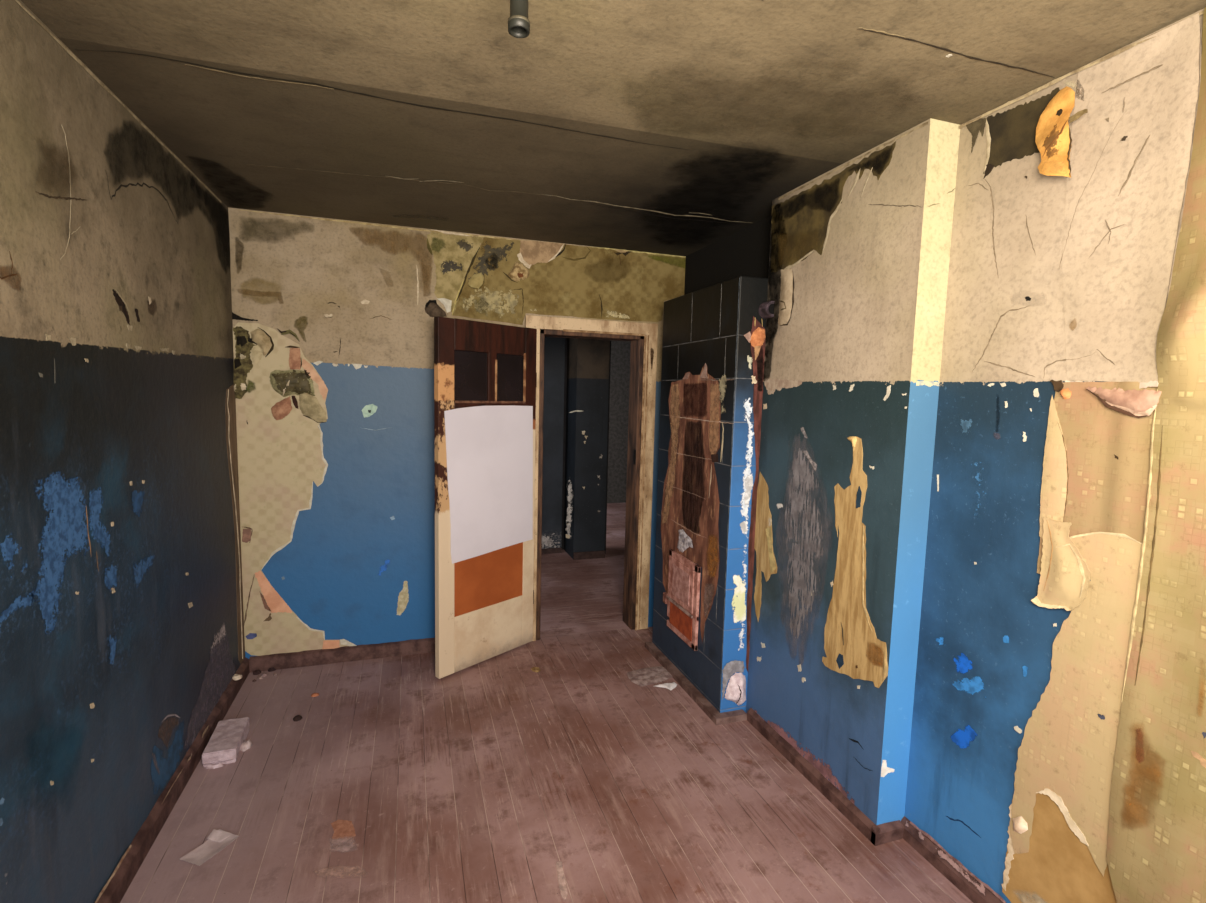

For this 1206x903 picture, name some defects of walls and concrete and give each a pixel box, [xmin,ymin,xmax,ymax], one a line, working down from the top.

leakage [105,123,305,302]
crack [15,0,688,258]
leakage [354,229,483,315]
peeling [771,141,896,326]
peeling [966,86,1088,179]
crack [860,10,1204,274]
crack [973,305,1115,377]
peeling [0,471,118,638]
peeling [225,322,368,664]
spalling [722,316,802,706]
peeling [952,653,986,698]
peeling [1010,517,1142,877]